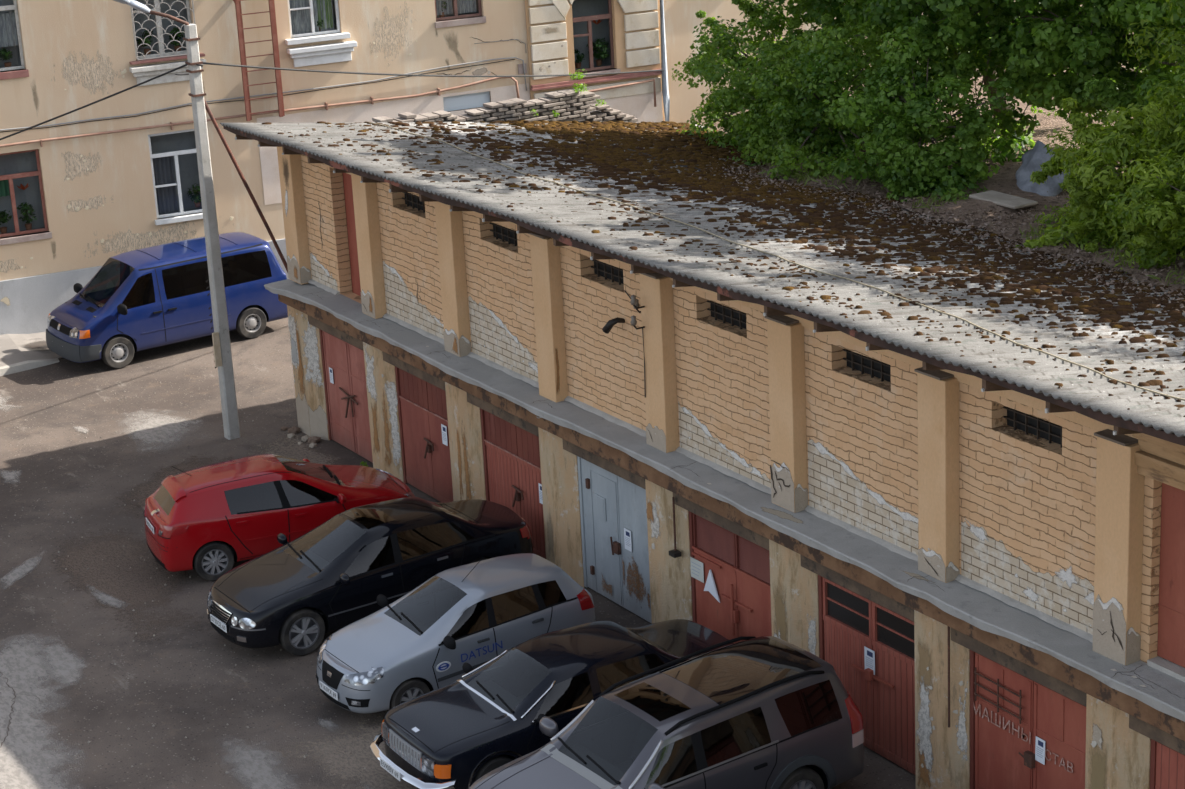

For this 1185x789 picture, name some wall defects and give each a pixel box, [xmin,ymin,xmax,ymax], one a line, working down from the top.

corrosion [602,557,650,607]
flaking render [646,402,1141,666]